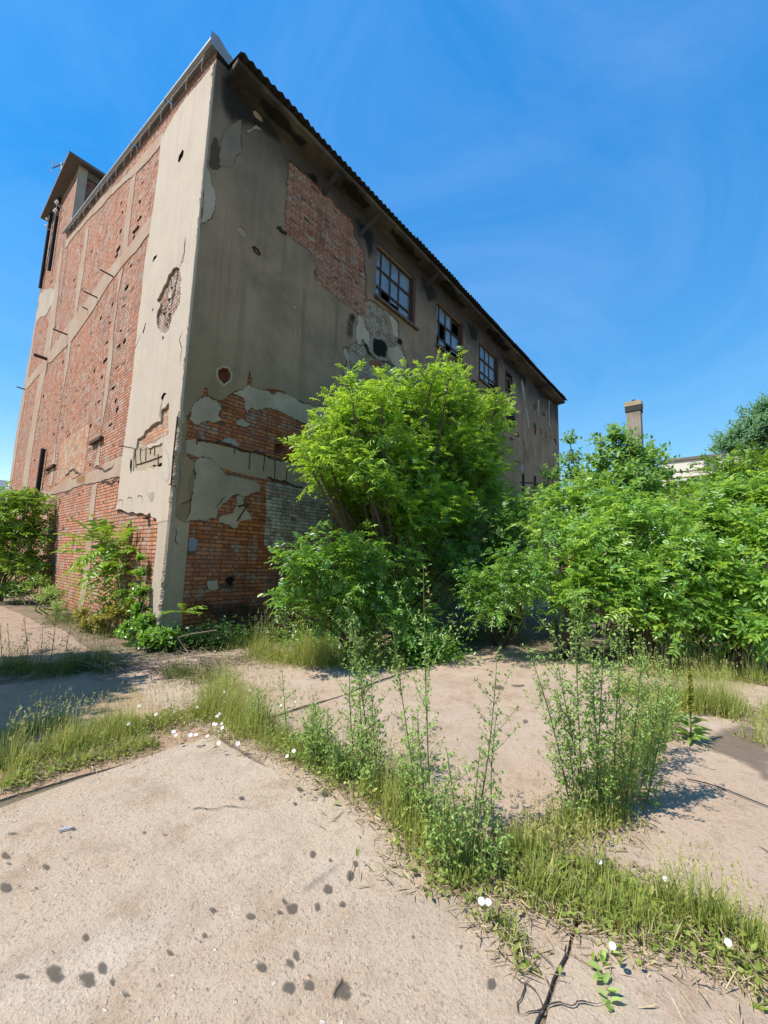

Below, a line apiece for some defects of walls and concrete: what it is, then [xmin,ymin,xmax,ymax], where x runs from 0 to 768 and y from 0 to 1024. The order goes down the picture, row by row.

peeling [200,110,263,229]
spalling [142,268,181,340]
peeling [277,161,409,400]
peeling [63,368,346,630]
crack [514,976,602,1014]